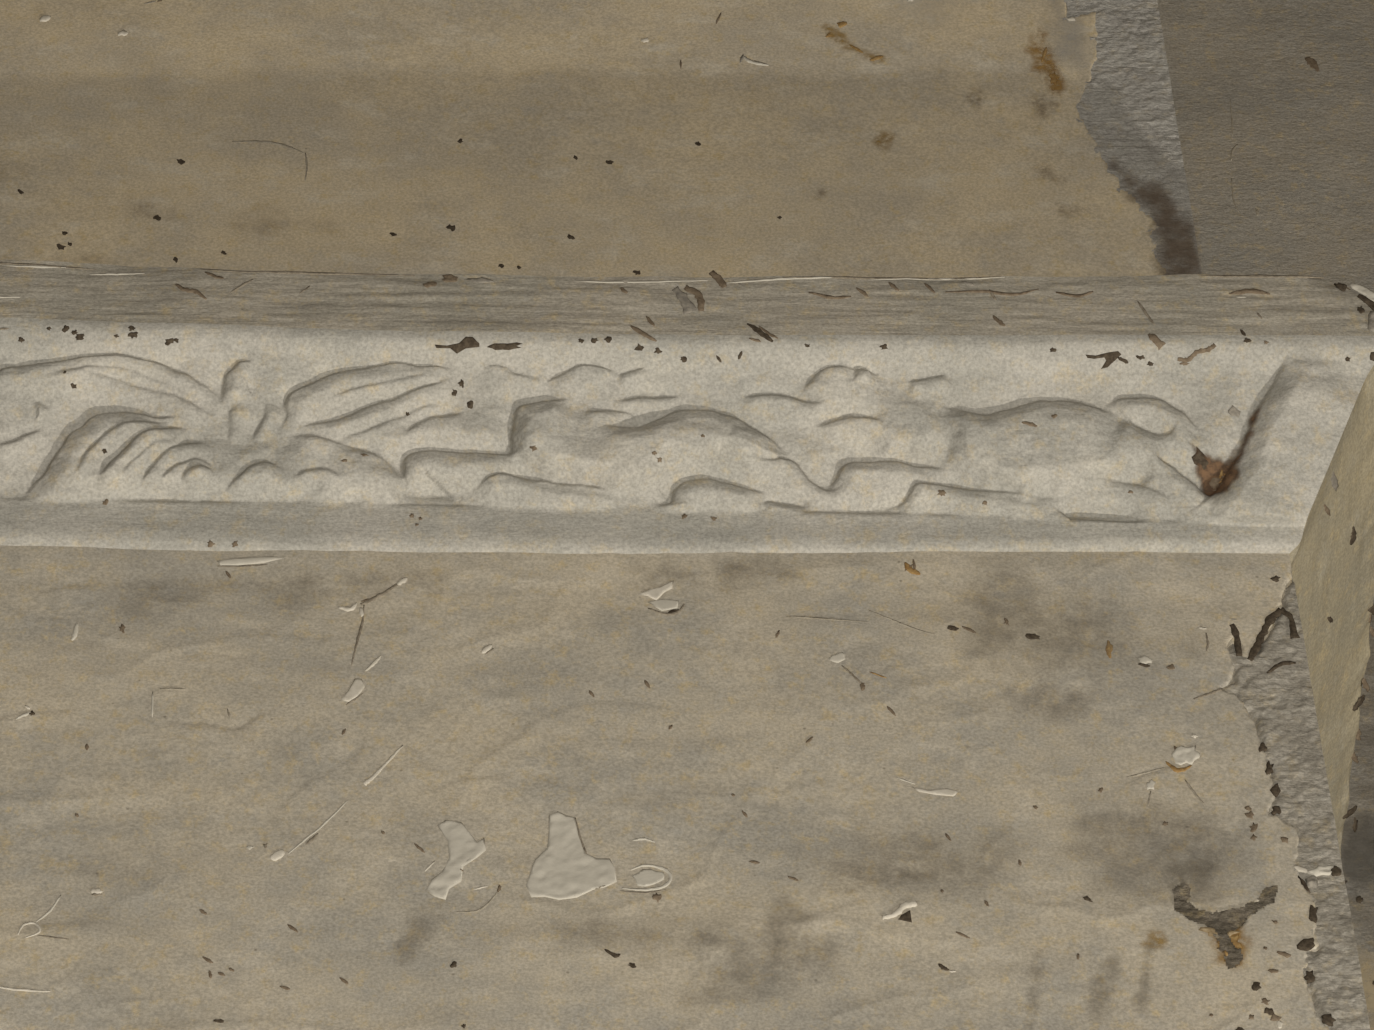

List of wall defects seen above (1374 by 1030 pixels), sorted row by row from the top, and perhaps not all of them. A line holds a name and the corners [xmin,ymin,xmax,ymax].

corrosion [825,21,884,61]
corrosion [1030,35,1063,91]
spalling [1063,0,1374,332]
spalling [0,262,143,275]
spalling [200,269,494,294]
peeling [1086,351,1154,369]
peeling [1177,343,1216,366]
corrosion [1192,410,1259,496]
spalling [1223,575,1374,1030]
peeling [425,820,502,913]
peeling [526,811,672,900]
peeling [1172,882,1278,969]